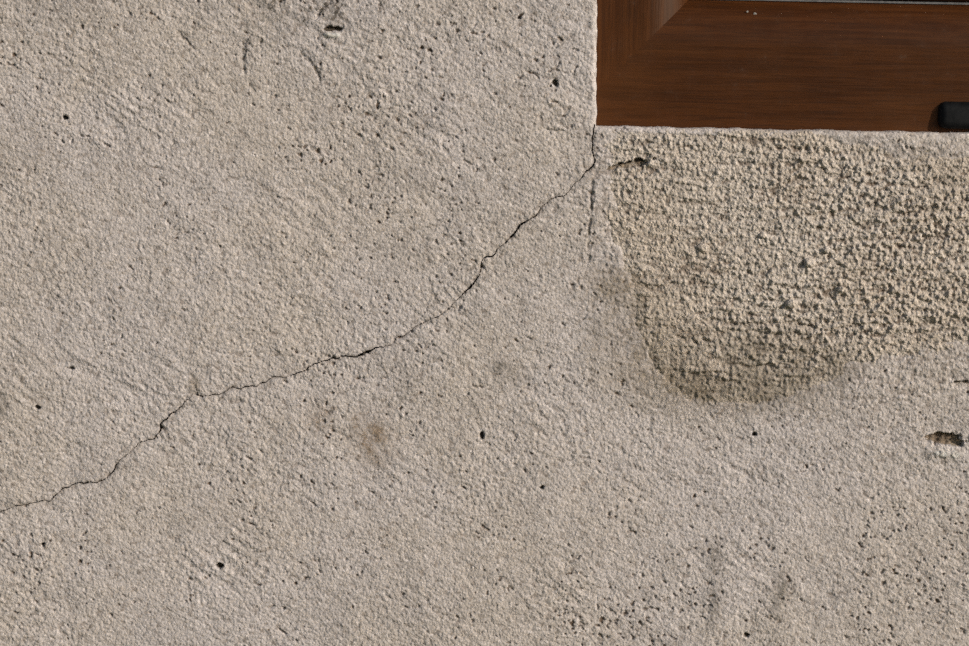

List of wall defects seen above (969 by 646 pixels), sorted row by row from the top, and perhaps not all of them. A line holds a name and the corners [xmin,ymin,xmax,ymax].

crack [1,124,597,512]